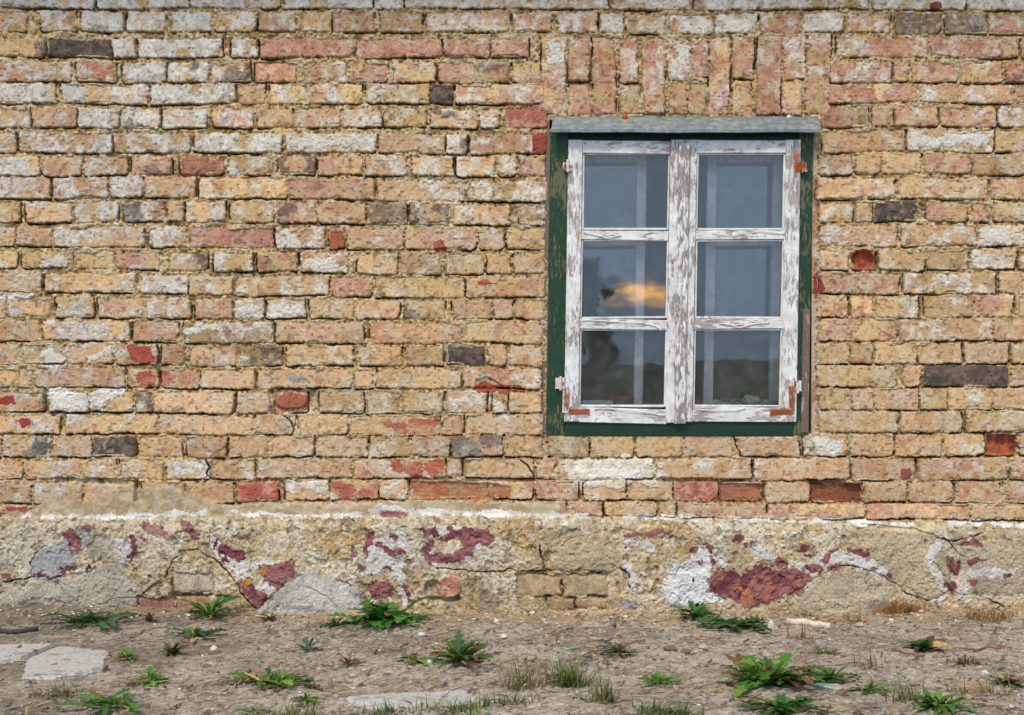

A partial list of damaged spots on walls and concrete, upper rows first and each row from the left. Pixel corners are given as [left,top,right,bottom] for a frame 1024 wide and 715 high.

rust [771,386,795,413]
peeling [0,524,96,580]
peeling [112,519,296,607]
crack [139,549,303,609]
peeling [347,523,496,610]
peeling [661,533,893,609]
crack [802,565,1004,608]
crack [868,524,984,556]